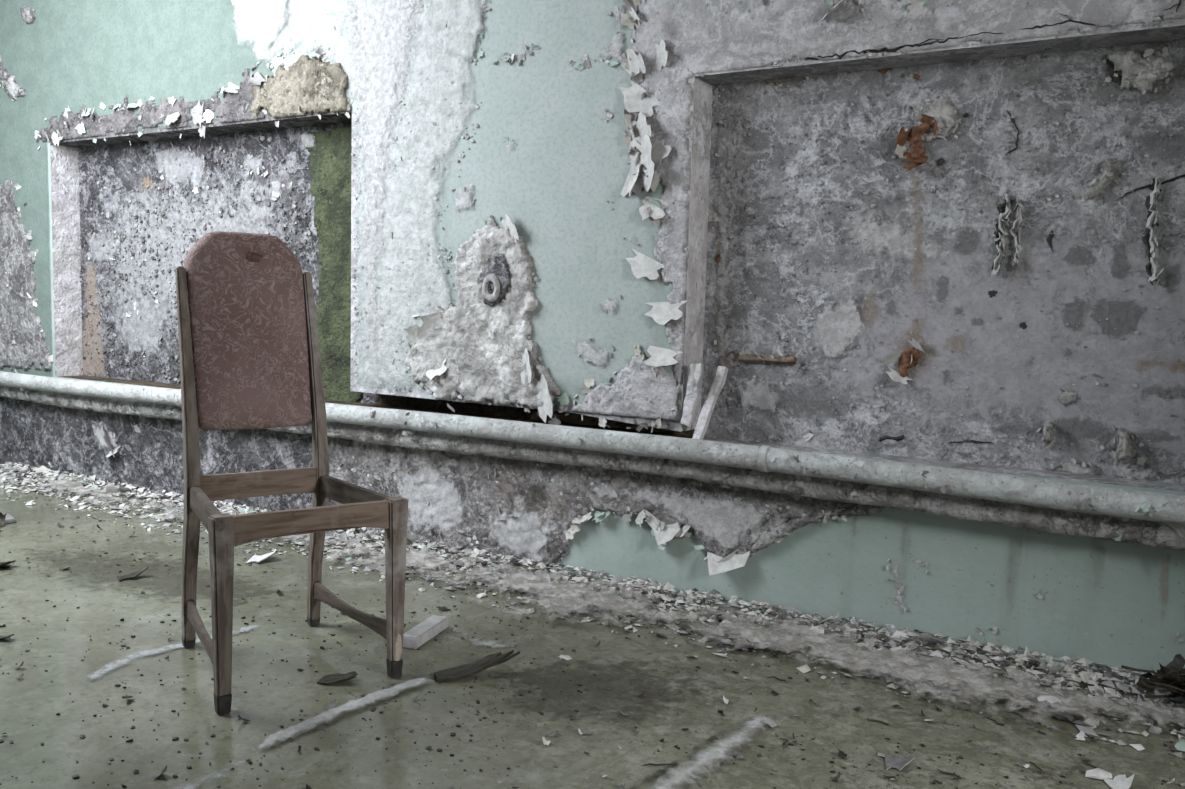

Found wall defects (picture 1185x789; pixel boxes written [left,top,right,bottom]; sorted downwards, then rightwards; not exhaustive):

crack [805,14,1096,60]
rust [895,114,938,172]
crack [1118,174,1185,199]
peeling [34,48,354,398]
peeling [403,0,1185,484]
peeling [0,180,54,373]
rust [738,347,797,364]
rust [884,338,924,385]
peeling [0,397,184,498]
peeling [198,427,313,475]
peeling [328,435,884,576]
peeling [245,550,277,564]